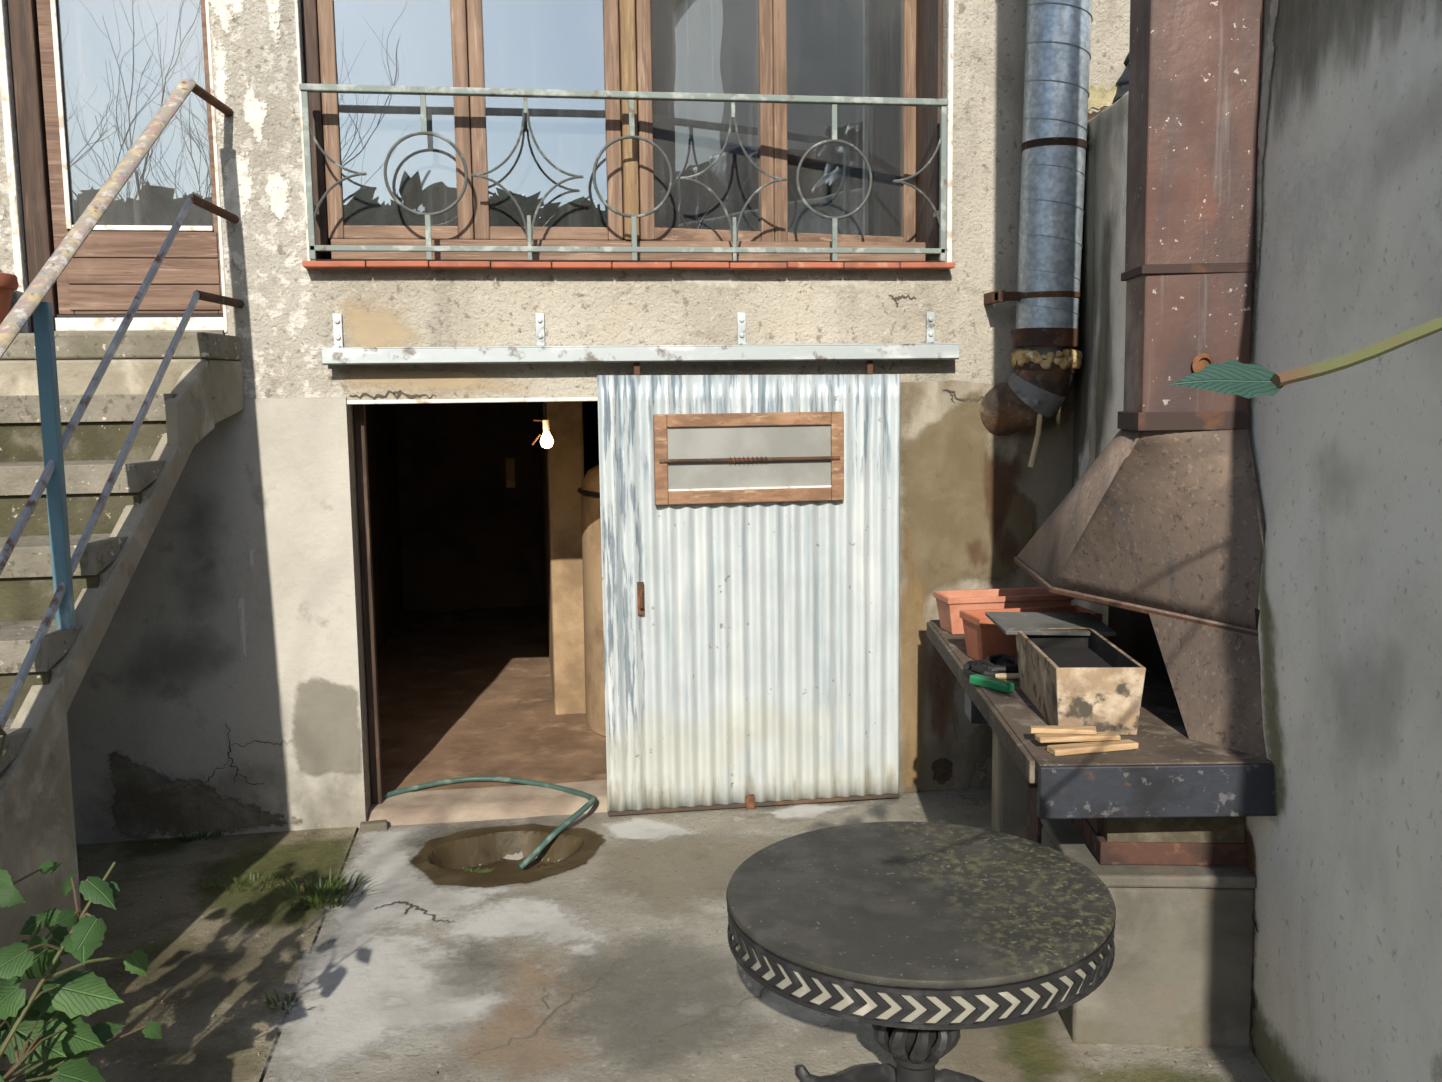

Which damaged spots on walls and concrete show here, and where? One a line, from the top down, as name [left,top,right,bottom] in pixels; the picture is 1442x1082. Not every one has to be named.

flaking render [208,0,291,227]
water stain [1273,0,1402,97]
water stain [899,140,1111,793]
crack [181,723,292,789]
water stain [769,804,844,820]
water stain [270,818,697,1082]